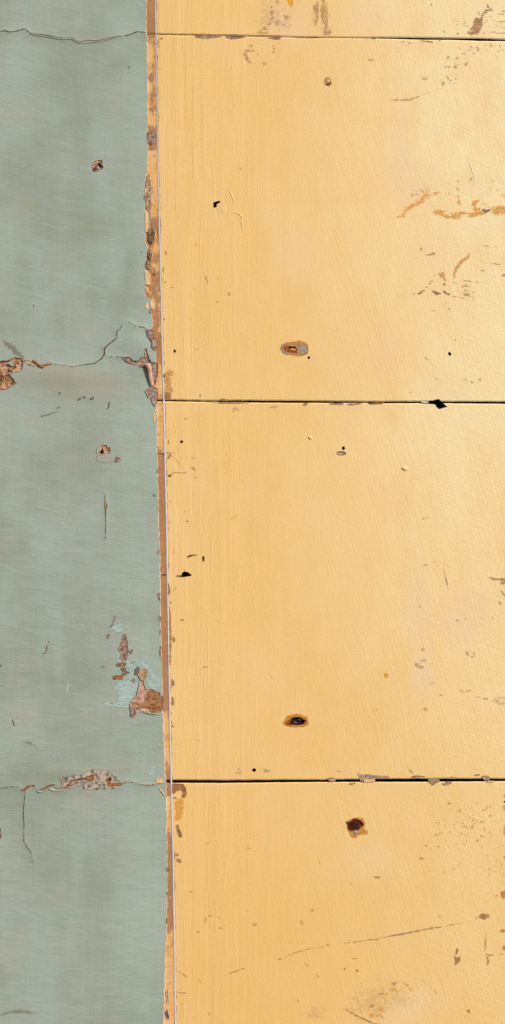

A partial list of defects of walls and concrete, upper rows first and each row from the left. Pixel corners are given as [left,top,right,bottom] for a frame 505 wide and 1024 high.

crack [0,28,145,43]
crack [56,324,146,367]
corrosion [280,341,308,356]
peeling [0,357,52,389]
peeling [104,611,175,717]
corrosion [283,714,309,728]
corrosion [346,817,368,838]